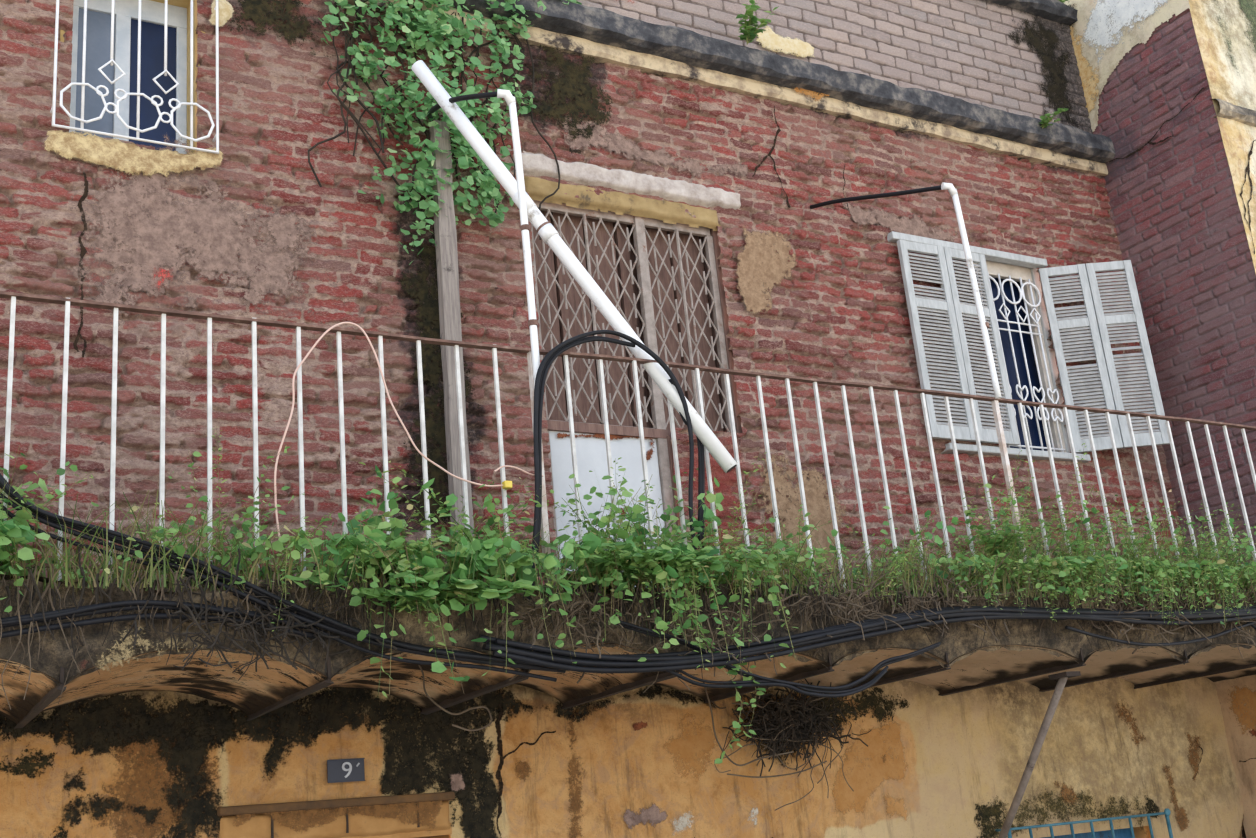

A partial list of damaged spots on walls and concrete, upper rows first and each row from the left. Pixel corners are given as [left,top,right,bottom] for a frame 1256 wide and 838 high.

damp [523,45,622,143]
damp [1008,16,1078,127]
damp [1239,0,1256,34]
crack [1240,140,1256,255]
crack [73,171,89,357]
spalling [1070,8,1256,564]
damp [0,687,459,838]